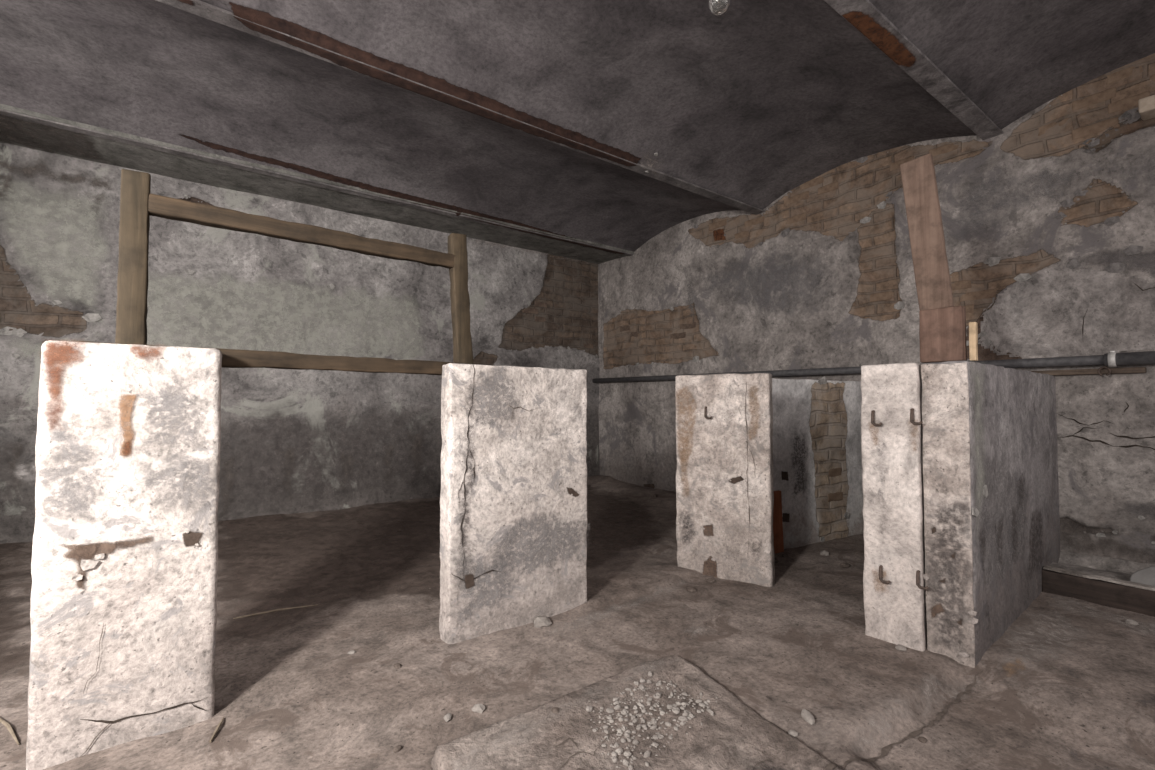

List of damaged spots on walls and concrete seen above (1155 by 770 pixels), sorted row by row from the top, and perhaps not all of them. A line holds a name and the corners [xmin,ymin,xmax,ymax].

rust [842,11,916,67]
spalling [179,195,214,206]
flaking render [688,53,1155,321]
peeling [0,184,106,359]
flaking render [473,249,719,369]
flaking render [950,245,1155,361]
rust [43,342,79,423]
rust [119,395,136,456]
crack [1033,393,1155,450]
spalling [64,536,152,589]
spalling [183,531,202,547]
crack [79,623,208,758]